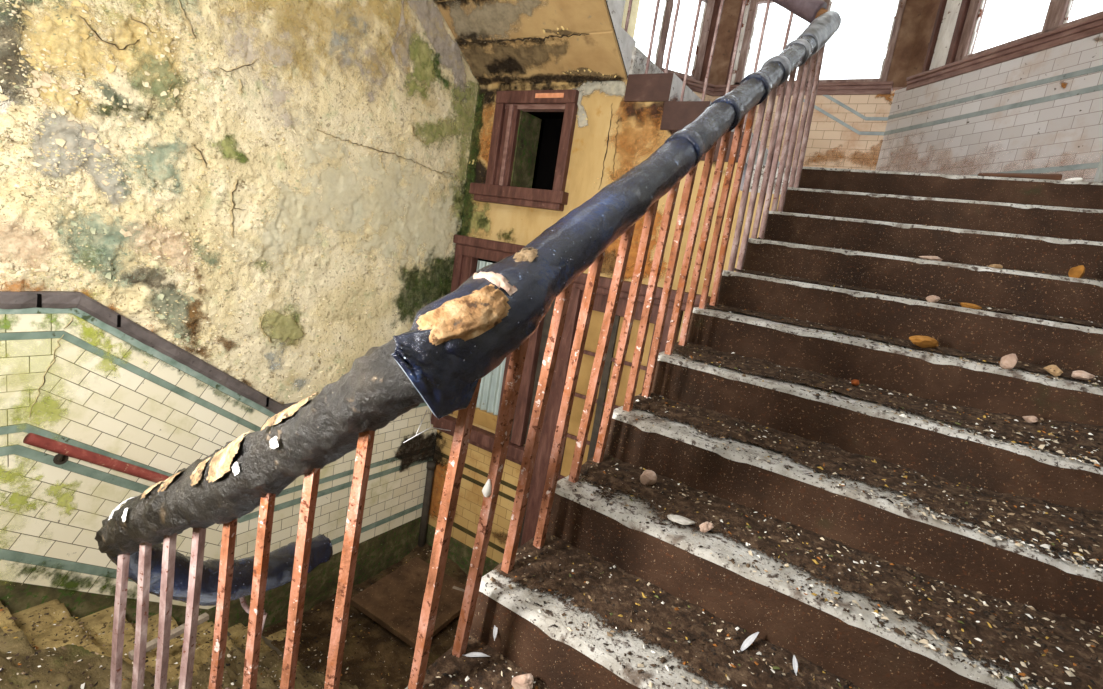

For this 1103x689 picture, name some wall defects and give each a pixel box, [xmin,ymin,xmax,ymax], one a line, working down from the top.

leakage [434,0,493,9]
leakage [455,37,554,47]
crack [316,125,460,180]